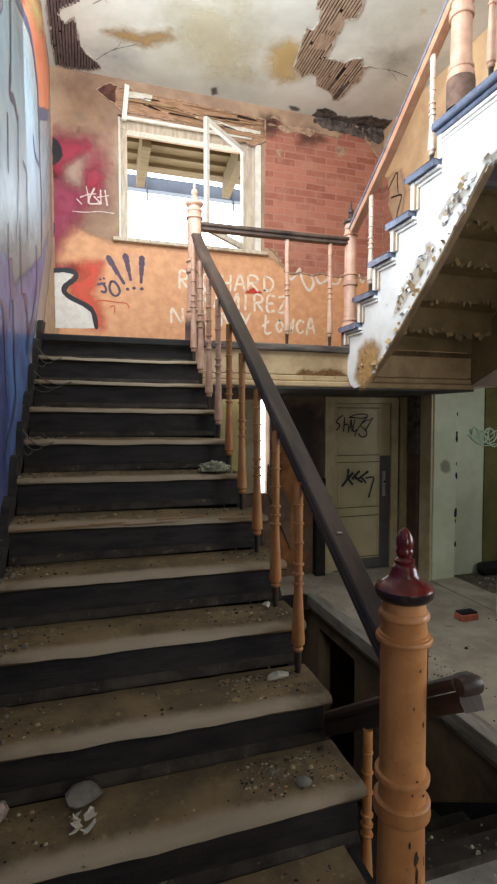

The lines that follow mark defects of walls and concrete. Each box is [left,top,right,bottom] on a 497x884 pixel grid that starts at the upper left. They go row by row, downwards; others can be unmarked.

spalling [45,0,102,71]
spalling [95,82,118,104]
flaking render [128,92,152,102]
water stain [273,43,299,80]
flaking render [194,0,392,279]
peeling [298,149,497,387]